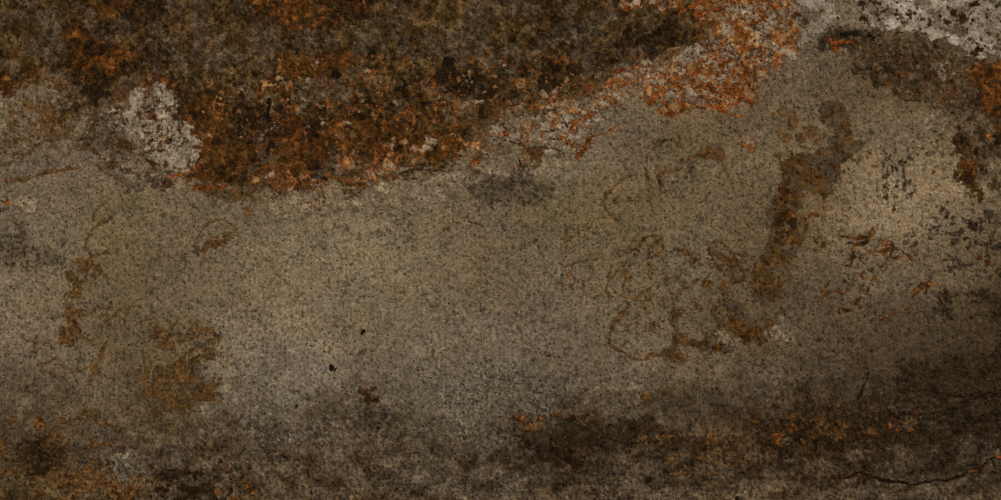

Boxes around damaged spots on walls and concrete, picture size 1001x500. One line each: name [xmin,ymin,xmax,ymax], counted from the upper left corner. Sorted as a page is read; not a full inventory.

corrosion [0,0,806,203]
corrosion [753,100,866,306]
corrosion [950,54,1001,270]
corrosion [821,225,919,314]
corrosion [139,320,233,419]
damp [404,347,573,455]
corrosion [0,405,163,500]
damp [104,447,145,483]
corrosion [196,444,339,500]